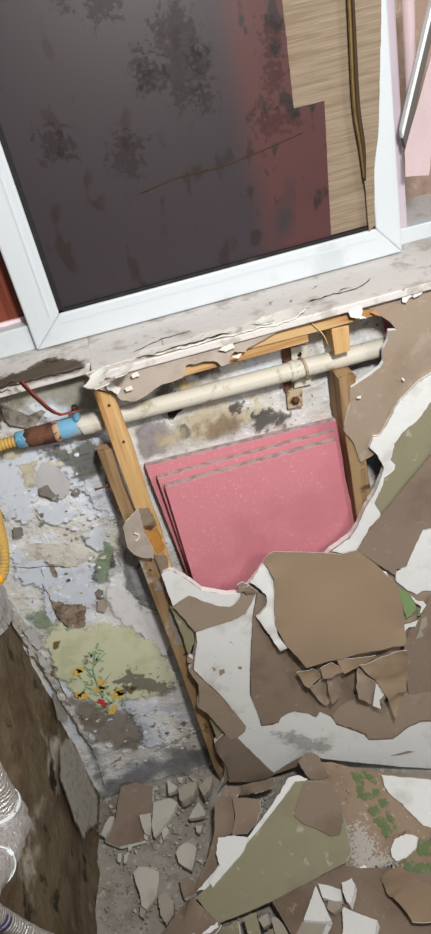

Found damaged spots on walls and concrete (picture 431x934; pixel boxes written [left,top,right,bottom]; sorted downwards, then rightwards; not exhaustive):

peeling [83,309,308,394]
leakage [137,400,292,457]
peeling [0,431,131,629]
flaking render [10,608,113,750]
peeling [113,700,197,765]
spalling [248,775,308,842]
spalling [197,864,220,892]